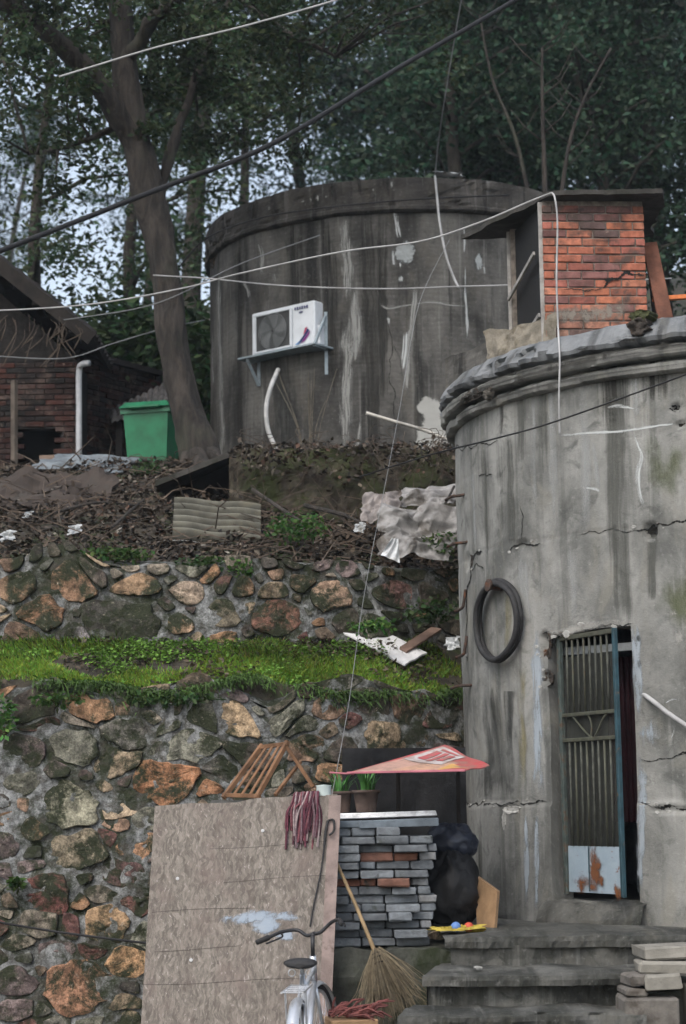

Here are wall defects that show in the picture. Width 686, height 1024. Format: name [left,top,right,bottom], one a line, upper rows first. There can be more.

leakage [289,228,302,305]
peeling [392,213,415,281]
crack [564,270,647,292]
leakage [325,220,469,445]
leakage [454,336,686,608]
crack [508,508,540,554]
crack [585,519,686,537]
crack [466,799,546,807]
crack [641,802,686,814]
rust [577,850,621,898]